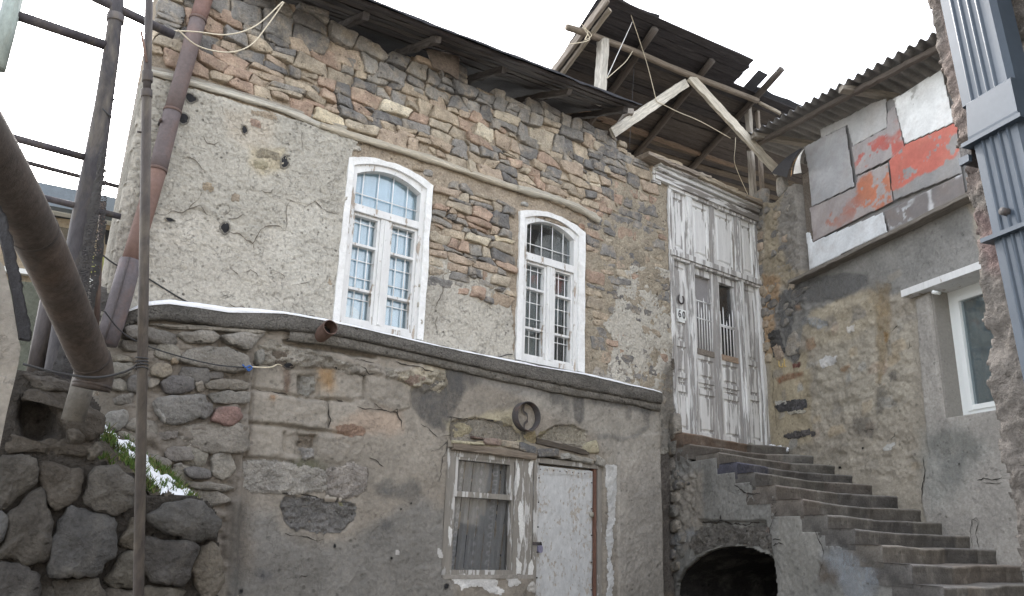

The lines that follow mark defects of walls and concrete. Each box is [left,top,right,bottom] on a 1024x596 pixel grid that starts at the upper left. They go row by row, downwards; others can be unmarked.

crack [157,138,341,308]
flaking render [768,329,785,358]
peeling [819,355,837,368]
flaking render [336,424,366,437]
crack [317,398,501,480]
water stain [413,371,473,428]
flaking render [775,399,807,415]
flaking render [784,428,815,439]
flaking render [243,433,368,549]
peeling [516,460,534,543]
peeling [605,464,617,596]
peeling [444,557,537,595]